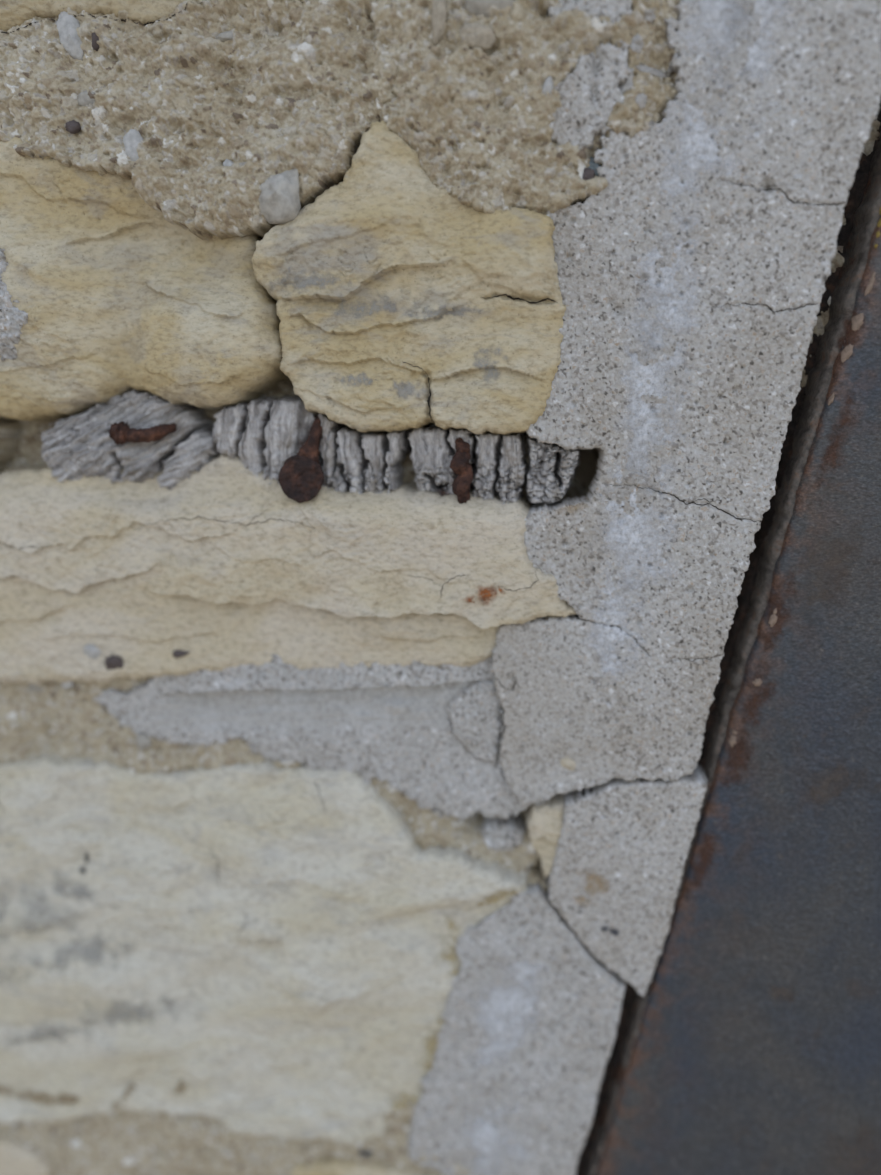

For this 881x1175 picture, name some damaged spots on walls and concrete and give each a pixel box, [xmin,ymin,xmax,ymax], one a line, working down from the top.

crack [719,180,846,206]
corrosion [839,320,858,348]
crack [609,484,761,522]
crack [576,617,719,662]
crack [573,778,657,798]